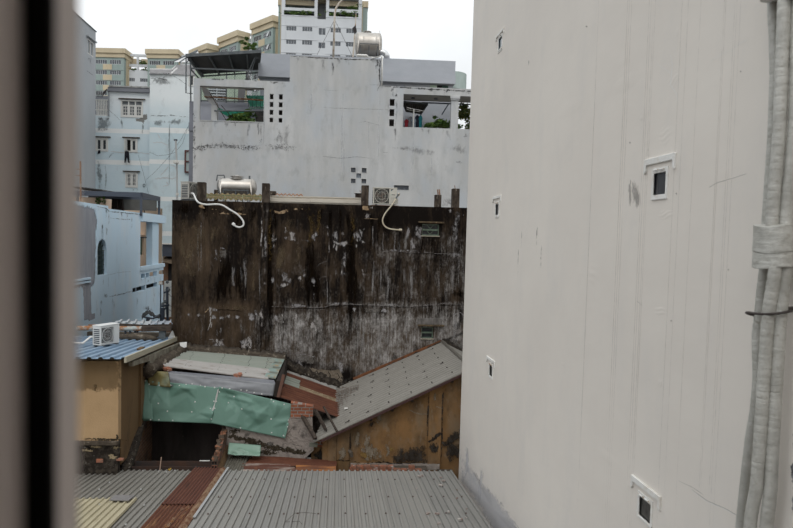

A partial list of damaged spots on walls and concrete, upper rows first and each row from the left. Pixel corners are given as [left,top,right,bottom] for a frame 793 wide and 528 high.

leakage [205,257,244,346]
leakage [249,213,294,341]
leakage [299,233,320,308]
leakage [320,210,388,323]
rust [140,467,229,528]
leakage [393,393,515,528]